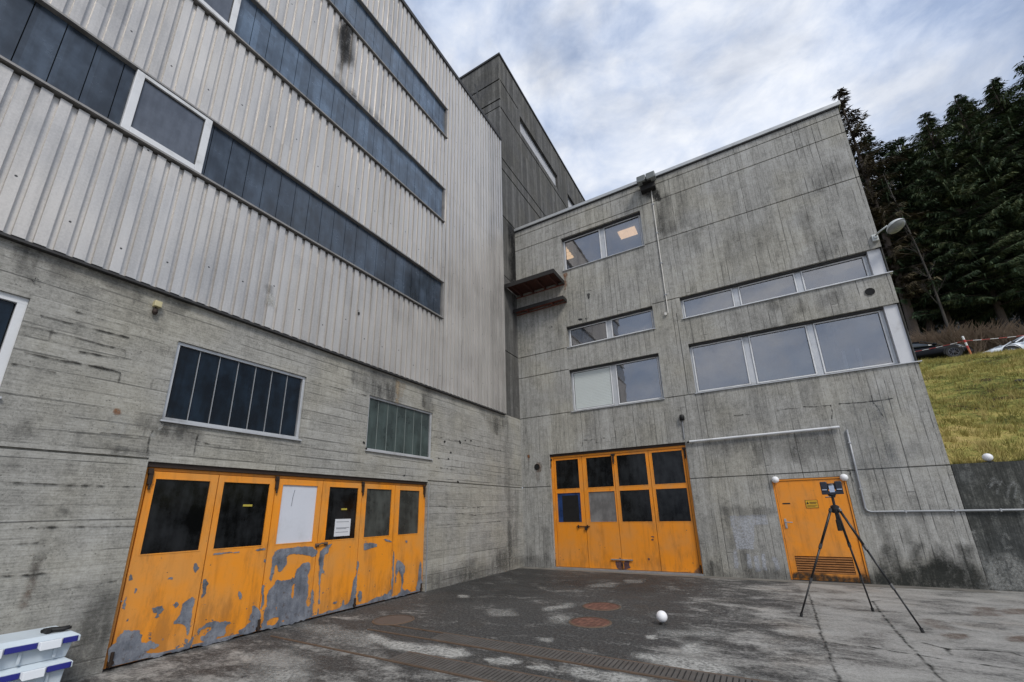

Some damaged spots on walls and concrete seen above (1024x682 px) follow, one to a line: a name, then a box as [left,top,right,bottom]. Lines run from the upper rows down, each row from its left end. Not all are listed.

peeling [108,539,422,664]